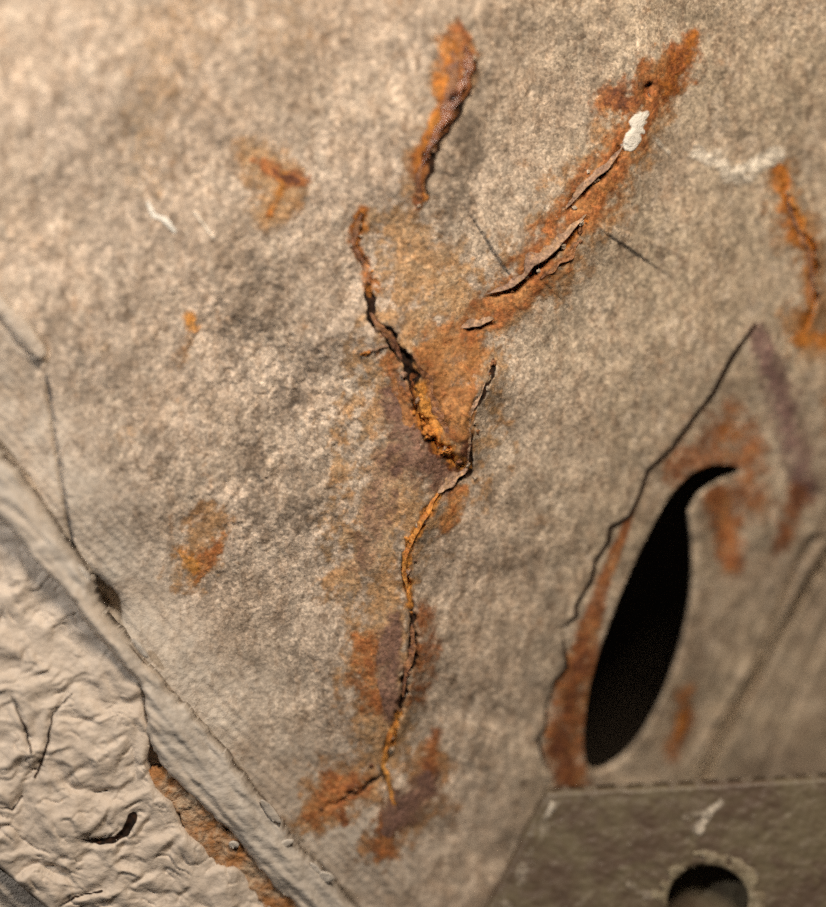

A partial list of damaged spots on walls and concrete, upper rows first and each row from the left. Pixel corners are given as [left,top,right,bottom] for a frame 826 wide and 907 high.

rust [233,137,309,231]
crack [402,17,478,218]
crack [461,58,688,337]
rust [595,30,698,113]
rust [170,499,236,595]
rust [290,194,513,865]
crack [319,206,497,811]
crack [536,323,757,769]
rust [544,514,634,787]
rust [665,685,694,764]
rust [149,764,297,907]